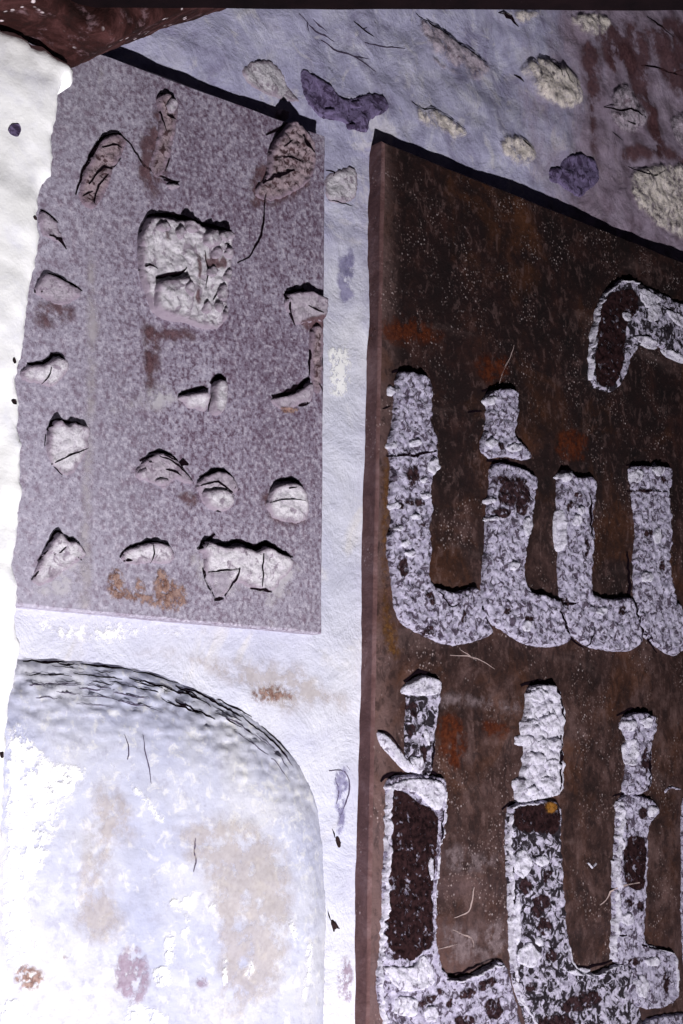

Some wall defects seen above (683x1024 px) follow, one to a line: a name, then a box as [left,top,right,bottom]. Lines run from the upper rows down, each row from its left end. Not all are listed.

spalling [137,212,236,330]
crack [238,194,266,263]
spalling [595,288,683,387]
spalling [45,418,90,476]
spalling [265,478,309,524]
spalling [482,476,533,537]
corrosion [108,569,186,611]
spalling [197,533,294,601]
crack [22,659,293,780]
spalling [383,675,504,1024]
peeling [512,850,557,968]
spalling [620,805,658,925]